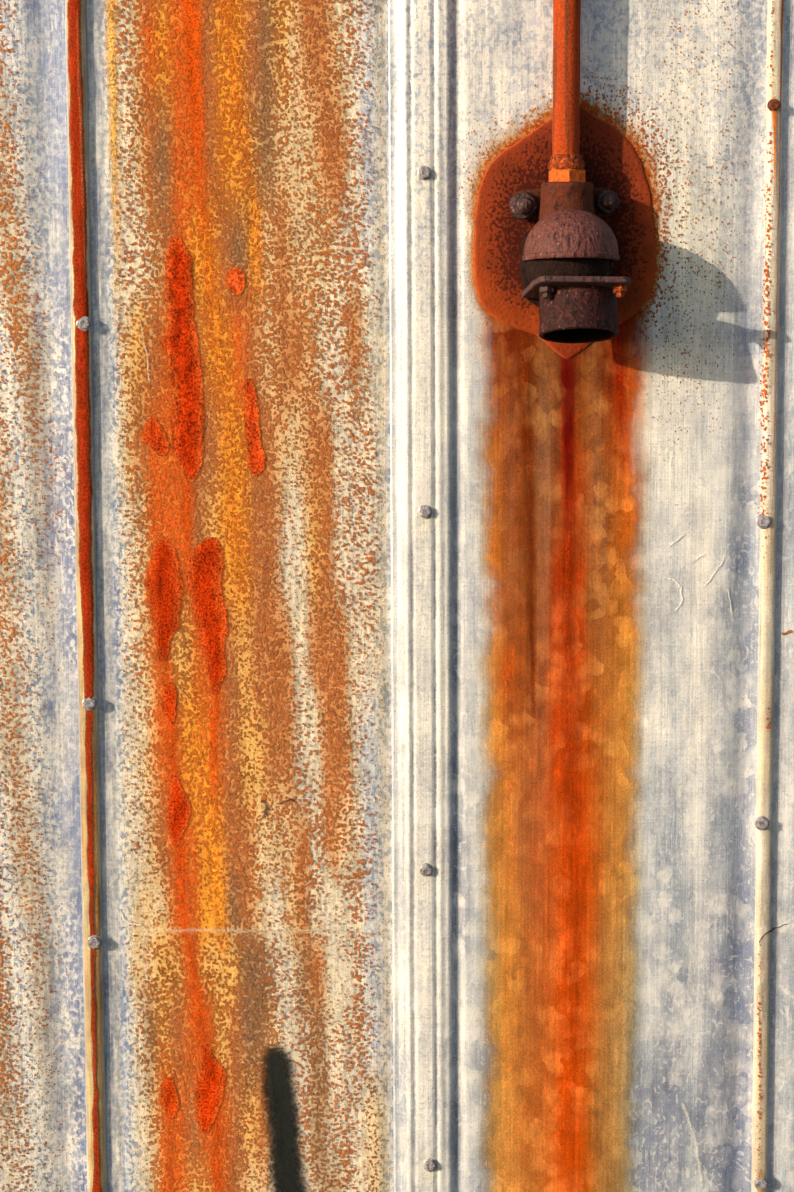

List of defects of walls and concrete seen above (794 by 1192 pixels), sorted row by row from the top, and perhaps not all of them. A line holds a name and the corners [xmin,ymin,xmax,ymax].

corrosion [0,0,102,1192]
corrosion [105,0,394,1192]
corrosion [425,0,784,1192]